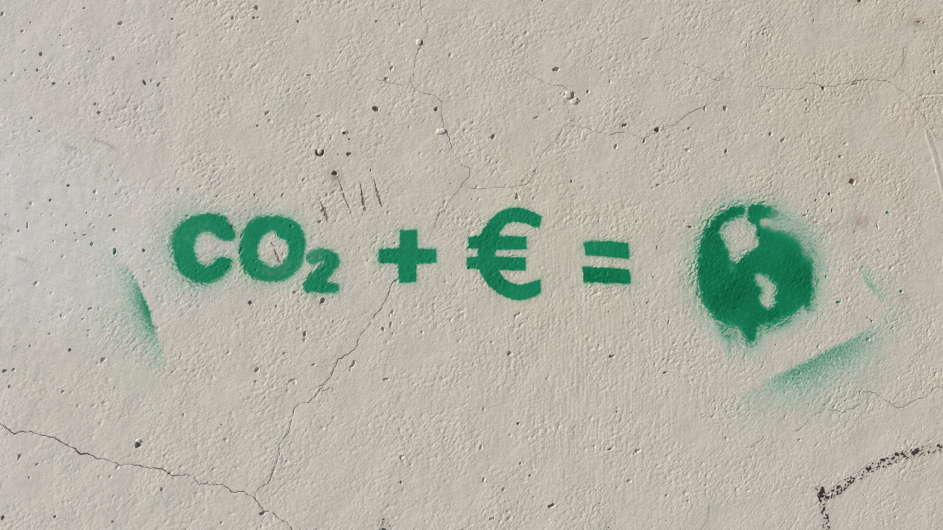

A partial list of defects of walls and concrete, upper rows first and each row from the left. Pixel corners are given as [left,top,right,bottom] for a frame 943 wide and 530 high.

crack [380,5,707,246]
crack [1,278,399,530]